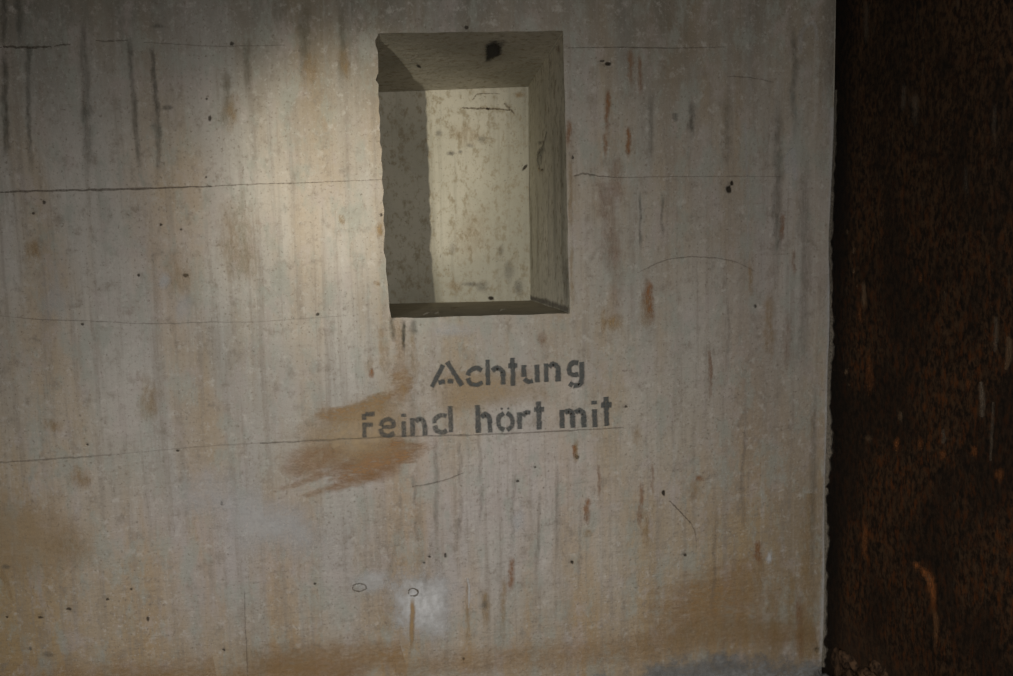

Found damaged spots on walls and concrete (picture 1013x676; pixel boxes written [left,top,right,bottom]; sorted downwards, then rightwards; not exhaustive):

leakage [392,579,447,634]